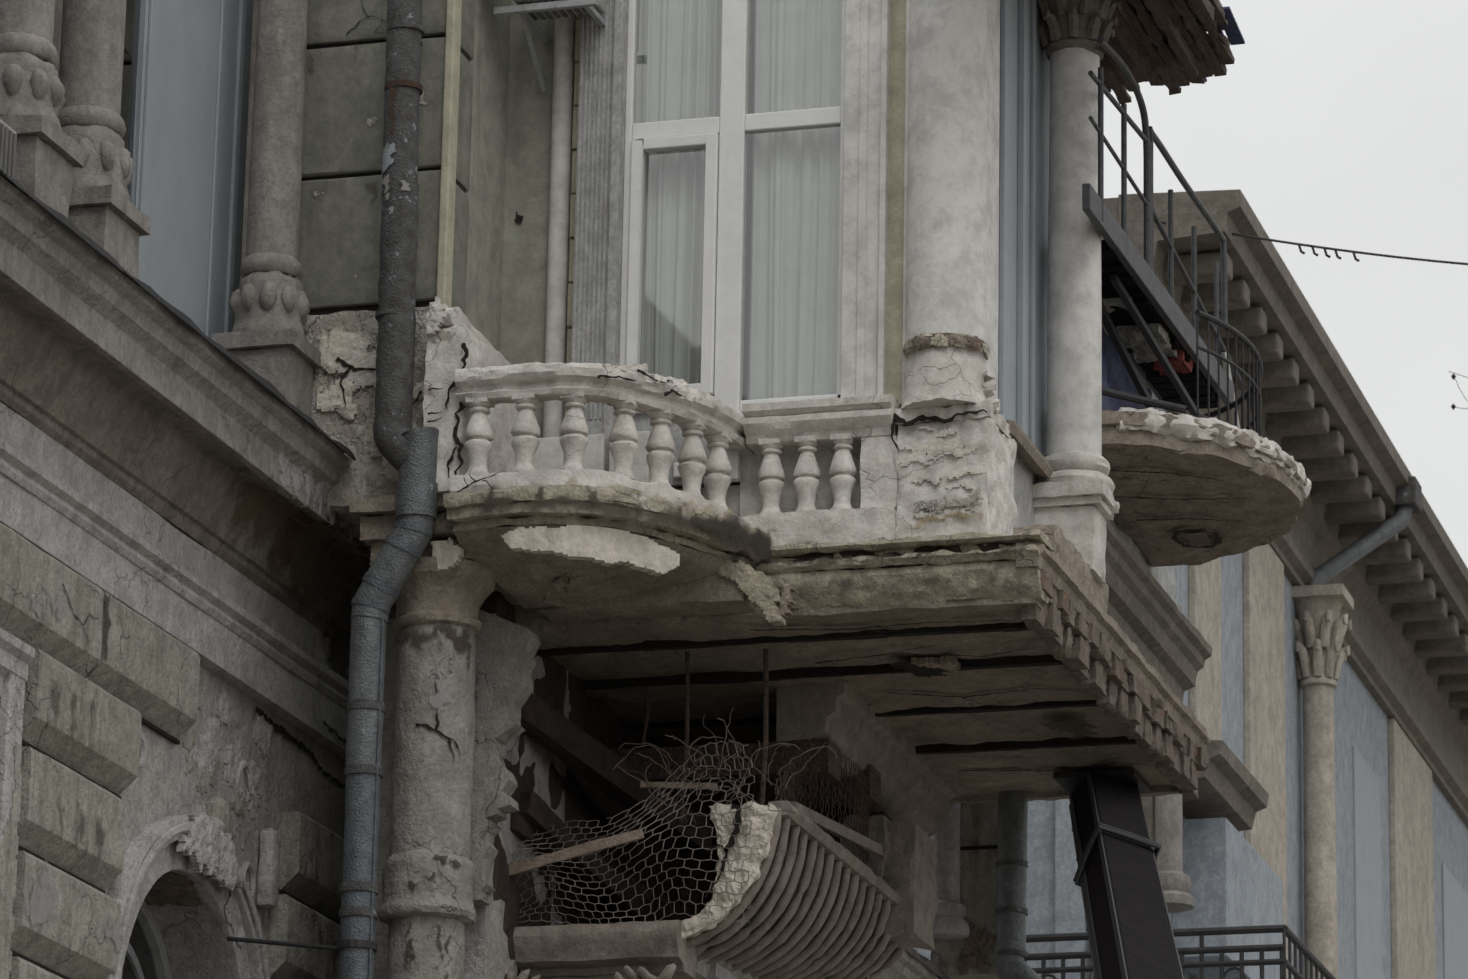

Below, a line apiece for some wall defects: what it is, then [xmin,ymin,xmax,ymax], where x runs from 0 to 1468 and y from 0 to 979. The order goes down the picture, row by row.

peeling [382,142,410,214]
flaking render [426,296,448,336]
flaking render [316,326,377,421]
spalling [903,332,1001,414]
flaking render [898,426,987,528]
spalling [501,525,680,576]
spalling [480,591,516,624]
spalling [718,558,796,626]
crack [749,620,1080,705]
crack [415,681,461,761]
spalling [493,648,892,979]